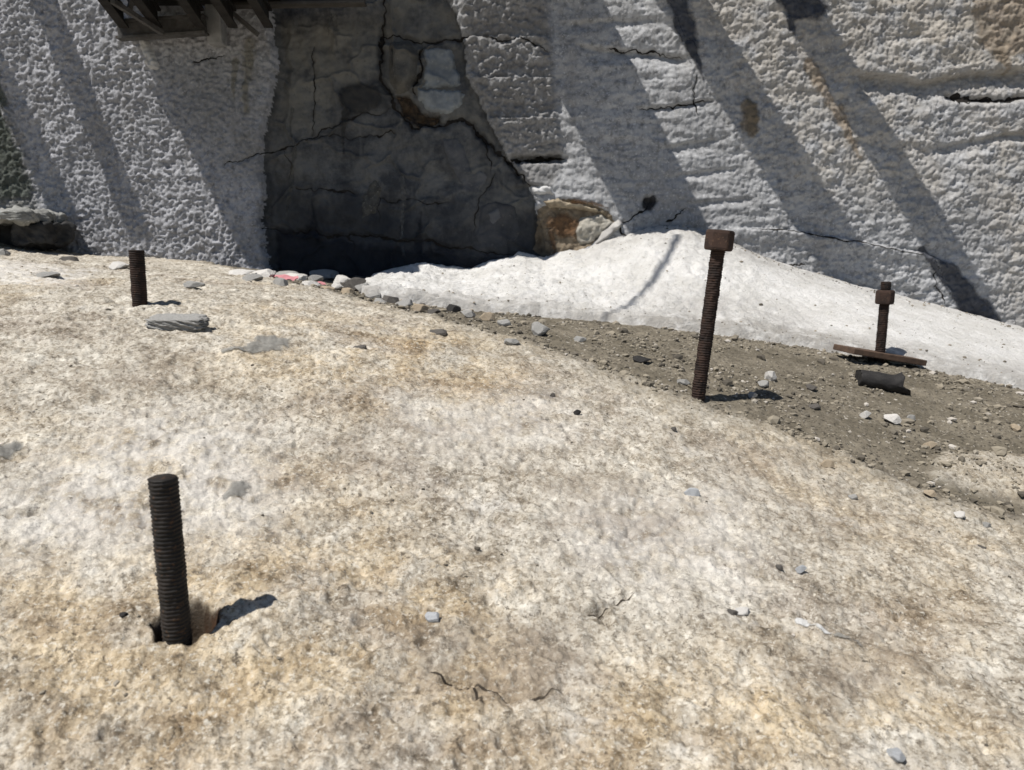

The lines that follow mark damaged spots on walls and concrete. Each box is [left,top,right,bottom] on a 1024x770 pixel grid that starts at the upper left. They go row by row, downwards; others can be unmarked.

crack [224,0,564,255]
peeling [397,48,465,127]
crack [609,48,711,113]
crack [946,93,1024,104]
crack [770,229,945,304]